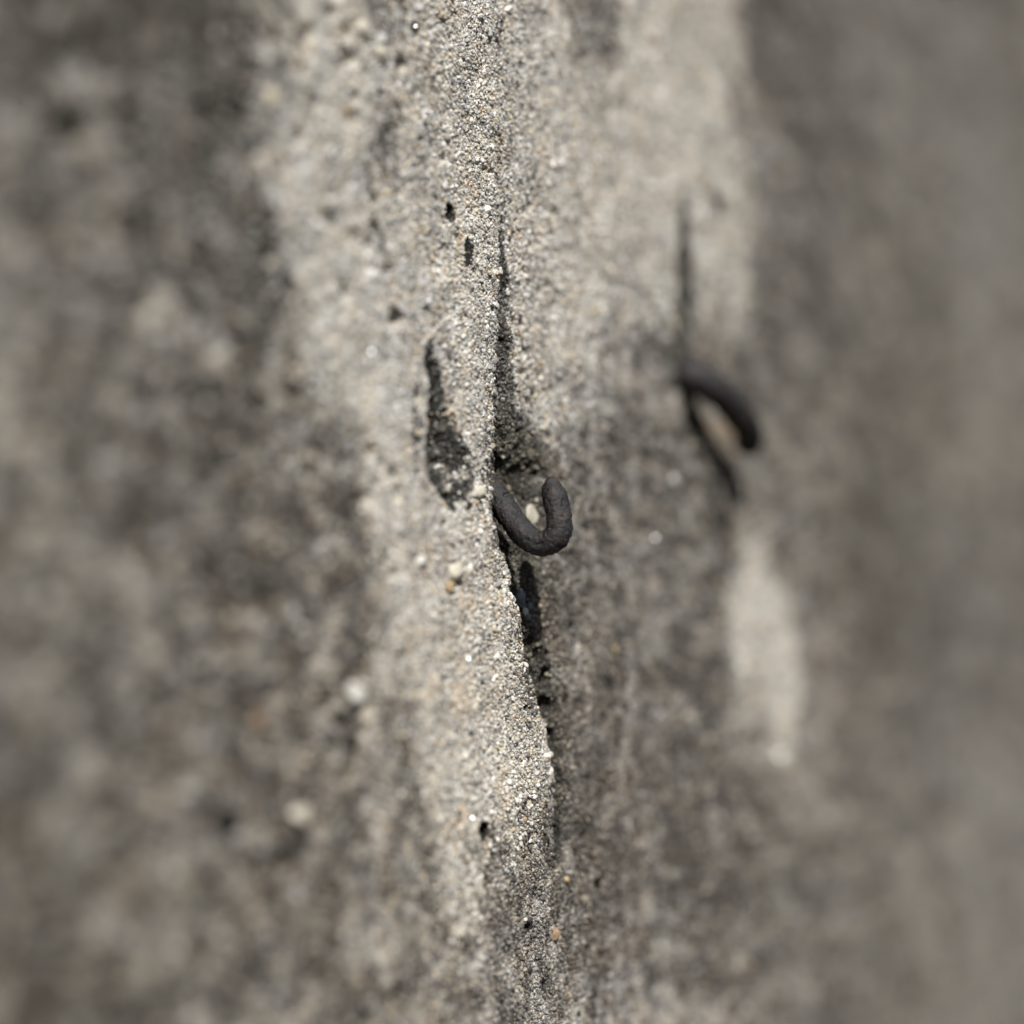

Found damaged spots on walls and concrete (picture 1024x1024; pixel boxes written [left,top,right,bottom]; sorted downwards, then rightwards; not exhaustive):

crack [492,216,537,435]
crack [523,643,566,865]